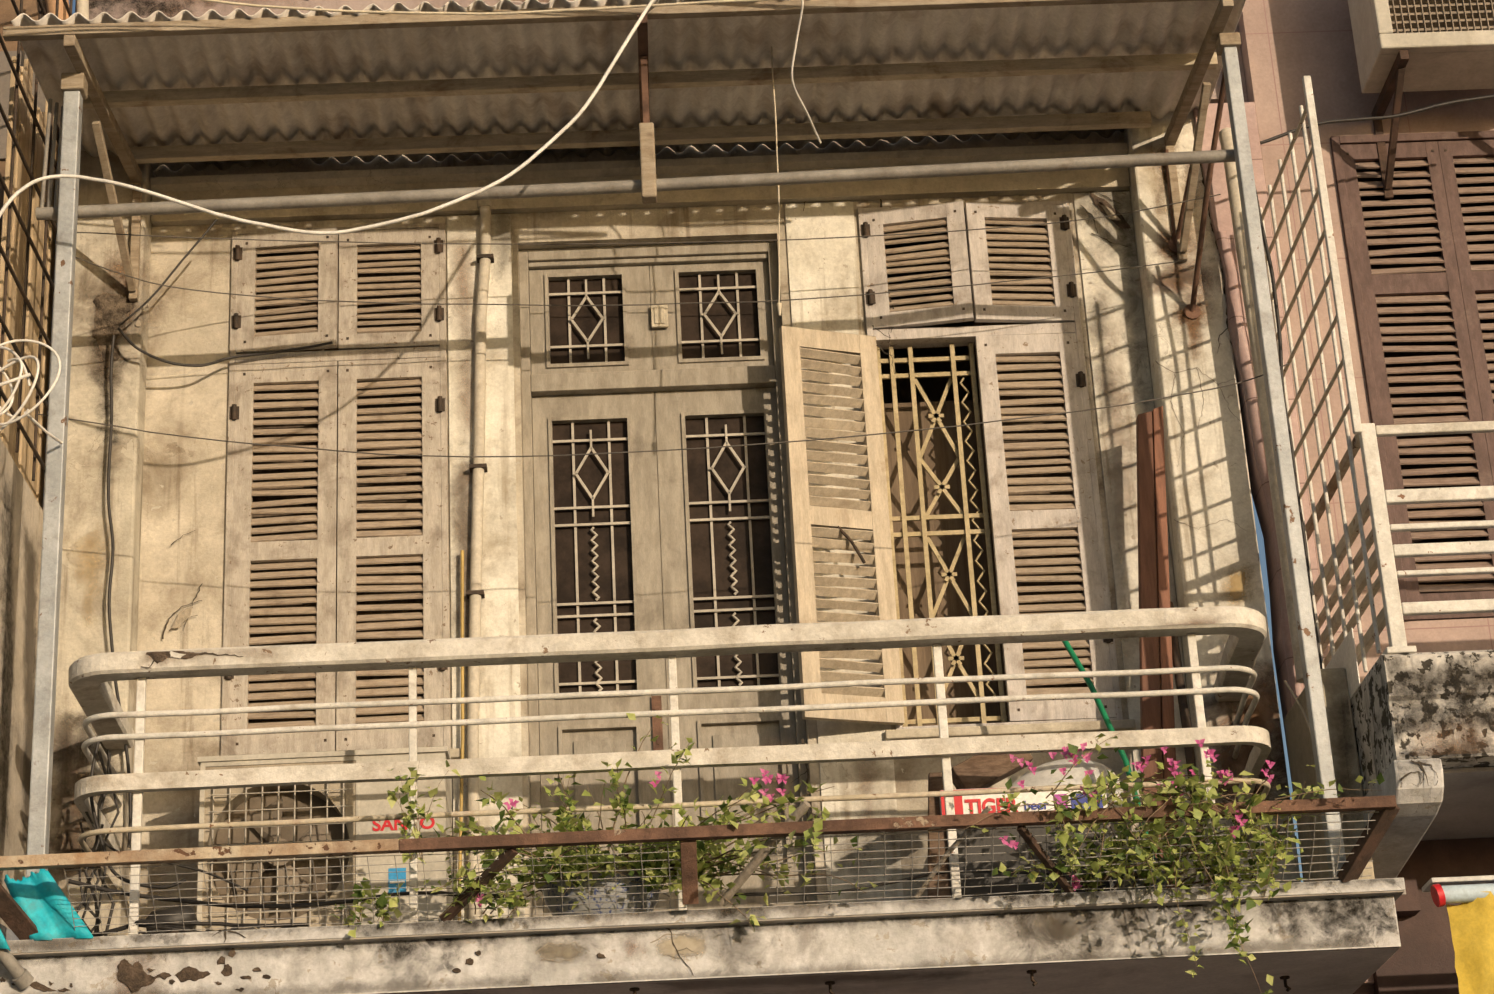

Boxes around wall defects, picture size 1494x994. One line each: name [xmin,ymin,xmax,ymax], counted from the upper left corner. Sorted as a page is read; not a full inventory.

rust [1160,234,1196,258]
rust [1177,300,1206,349]
crack [1155,164,1240,467]
water stain [1,491,37,841]
peeling [141,584,243,668]
water stain [1390,656,1494,756]
water stain [48,717,103,875]
peeling [117,948,271,993]